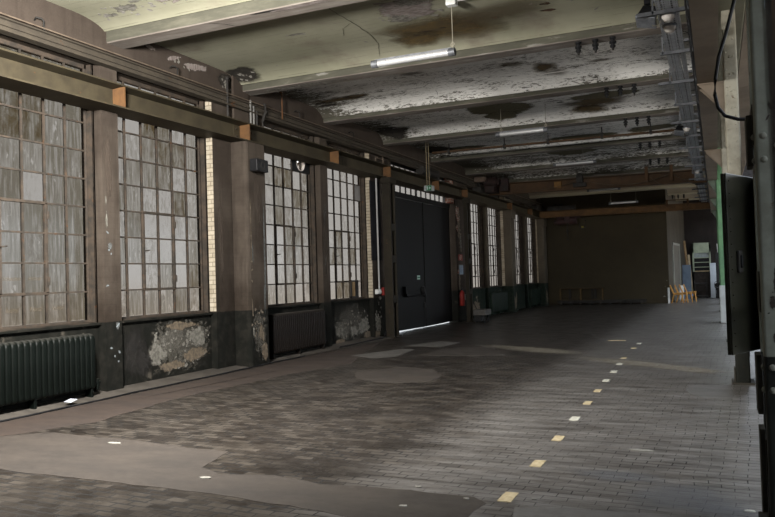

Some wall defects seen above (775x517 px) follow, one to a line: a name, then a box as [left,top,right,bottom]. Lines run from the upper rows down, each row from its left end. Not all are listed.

leakage [388,2,531,45]
peeling [466,100,535,120]
peeling [549,132,617,140]
peeling [627,123,678,133]
peeling [145,318,211,375]
peeling [252,299,268,362]
peeling [332,304,382,344]